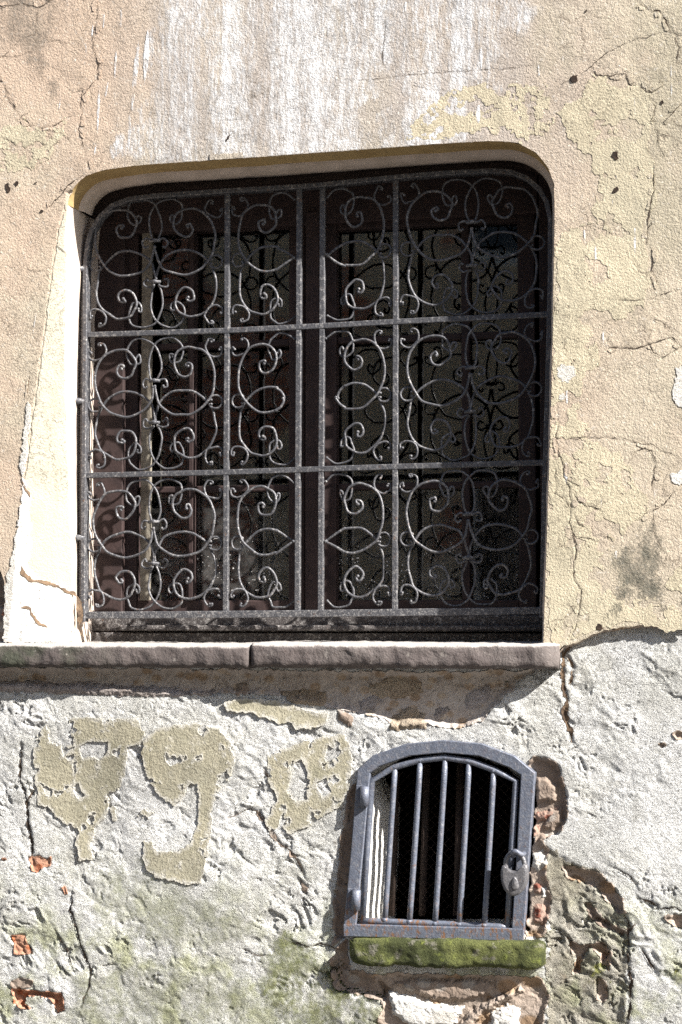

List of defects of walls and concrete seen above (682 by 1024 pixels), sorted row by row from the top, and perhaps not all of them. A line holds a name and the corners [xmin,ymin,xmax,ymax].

crack [0,0,103,207]
crack [562,4,682,357]
peeling [406,74,682,653]
crack [20,567,85,639]
crack [551,407,679,742]
damp [612,525,664,611]
crack [19,748,34,857]
crack [55,894,92,1003]
flaking render [0,667,632,1024]
flaking render [664,914,682,928]